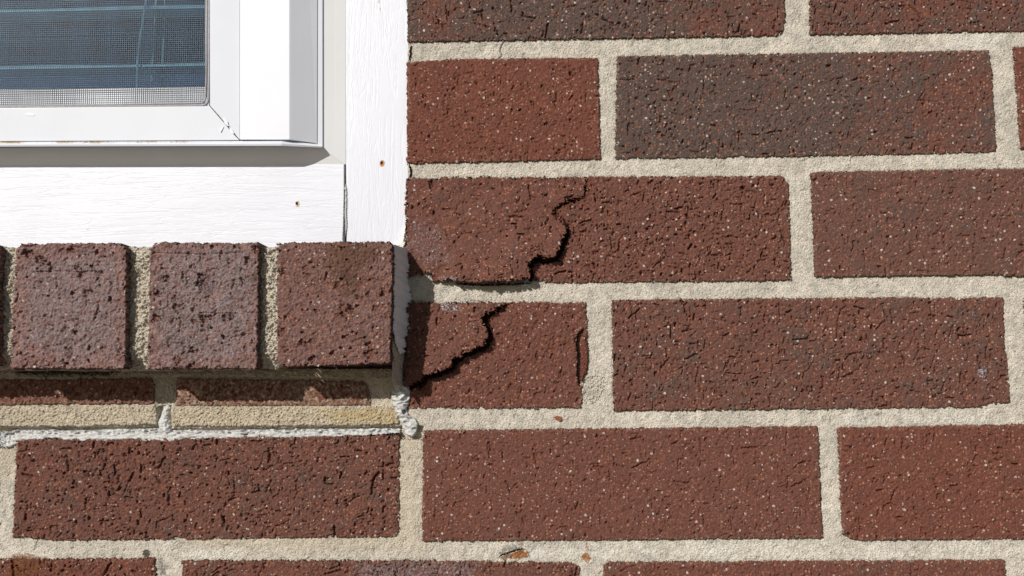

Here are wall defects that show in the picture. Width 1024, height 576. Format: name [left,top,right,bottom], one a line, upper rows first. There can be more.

crack [404,165,589,286]
crack [573,331,588,381]